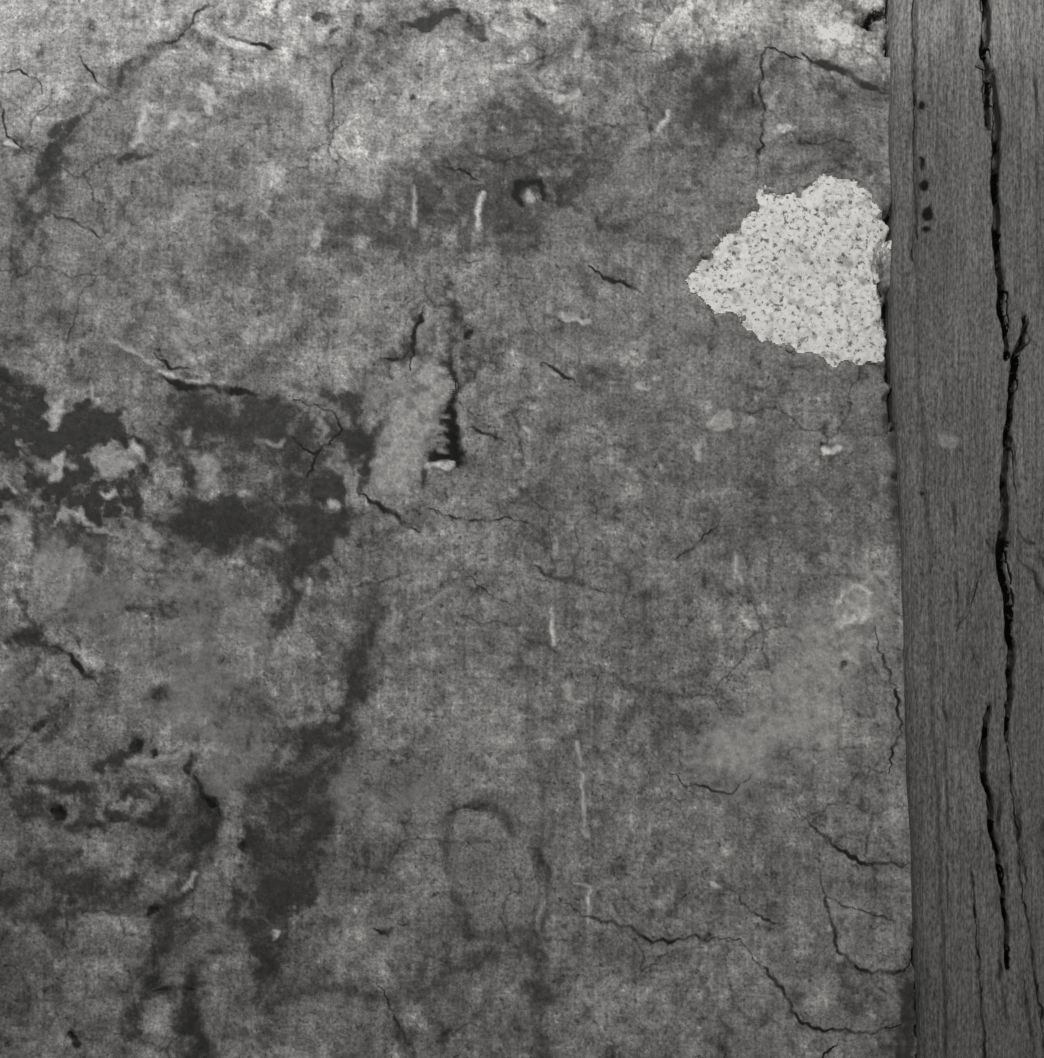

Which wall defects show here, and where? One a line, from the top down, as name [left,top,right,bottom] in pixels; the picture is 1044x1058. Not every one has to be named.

crack [752,46,880,153]
spalling [685,174,892,368]
crack [384,309,424,370]
leakage [0,367,390,653]
crack [965,0,1044,1058]
crack [45,645,100,686]
leakage [150,686,176,702]
leakage [232,622,374,979]
crack [799,811,911,867]
crack [559,898,697,944]
crack [823,897,911,974]
crack [725,937,916,1058]